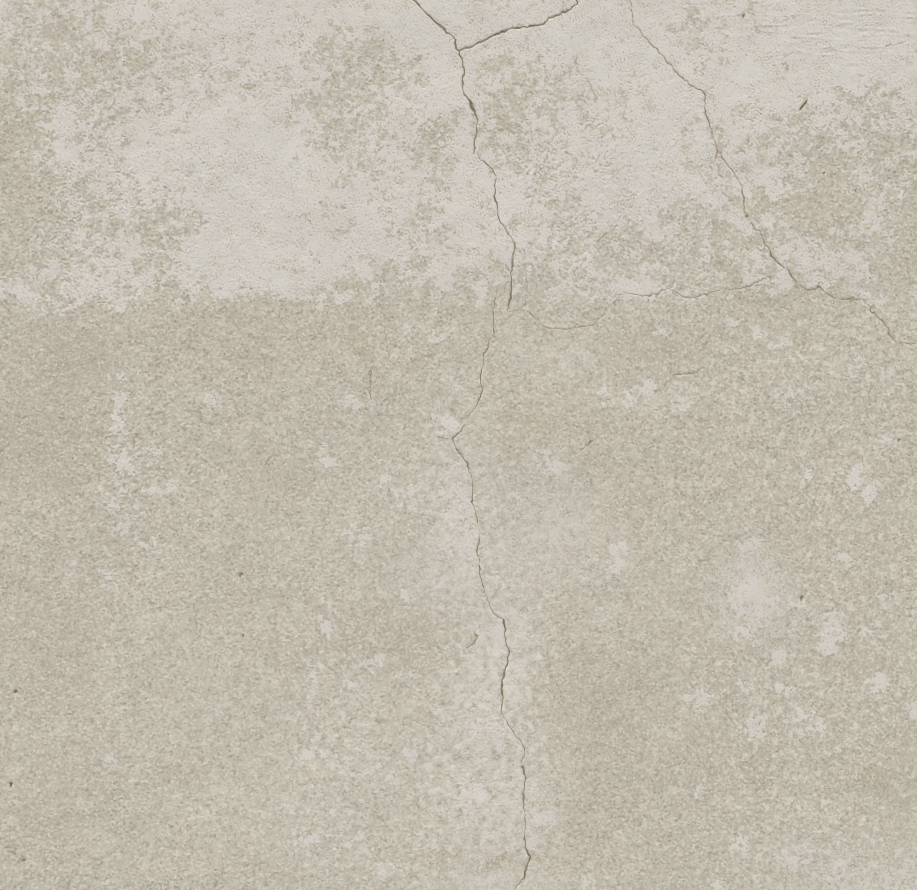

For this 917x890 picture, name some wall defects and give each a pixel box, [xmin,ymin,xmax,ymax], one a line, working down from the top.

crack [413,0,914,889]